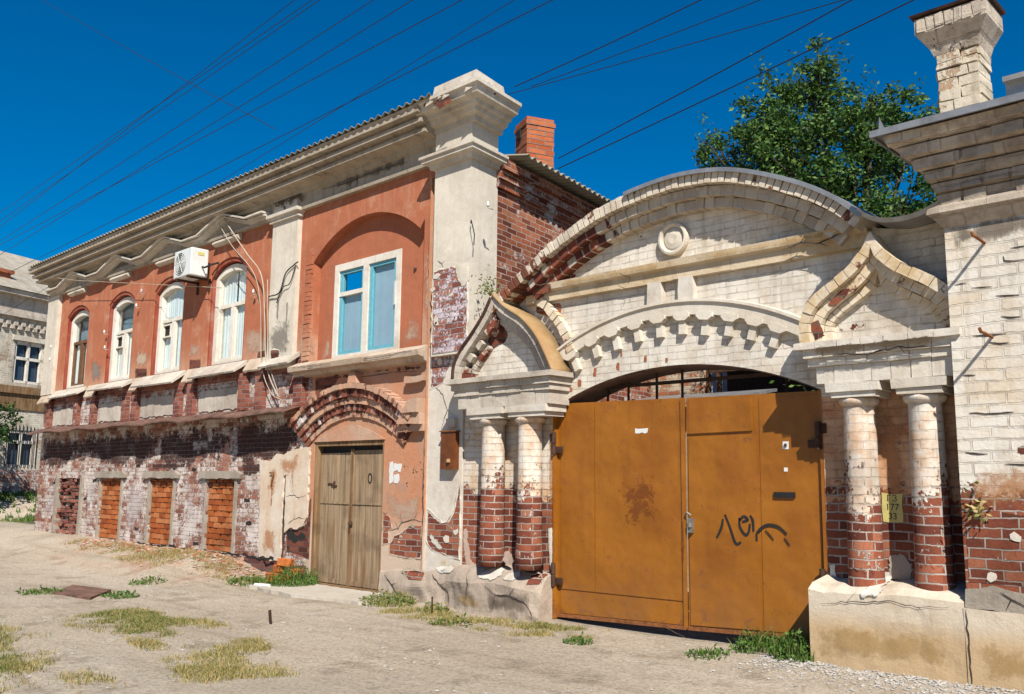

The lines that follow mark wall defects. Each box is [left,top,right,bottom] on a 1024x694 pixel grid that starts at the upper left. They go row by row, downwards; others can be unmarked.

spalling [430,266,469,390]
flaking render [244,447,312,583]
crack [281,474,303,558]
crack [393,389,532,616]
spalling [382,462,553,585]
flaking render [847,523,951,598]
flaking render [965,474,1024,586]
crack [820,595,973,682]